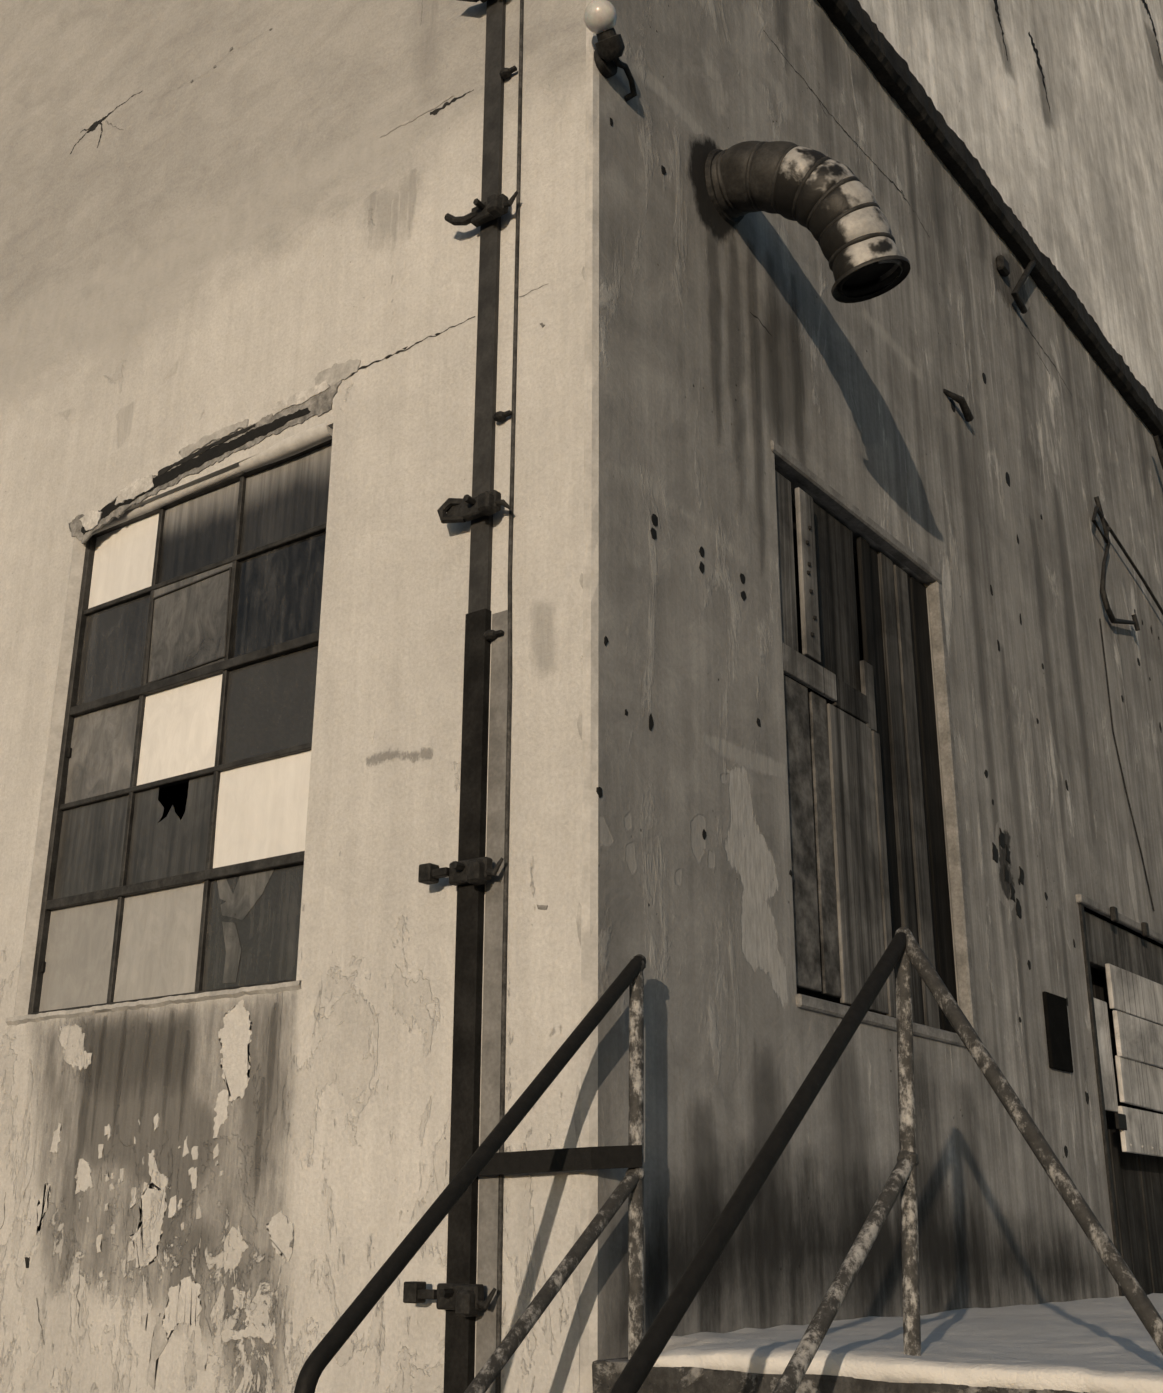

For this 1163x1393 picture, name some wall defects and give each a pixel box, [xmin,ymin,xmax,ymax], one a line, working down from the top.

crack [70,28,272,154]
crack [380,89,474,138]
peeling [0,42,462,457]
crack [350,316,475,377]
spalling [69,359,361,544]
peeling [59,1024,93,1070]
peeling [35,1182,51,1235]
peeling [50,1123,62,1154]
peeling [75,1000,252,1328]
leakage [20,966,310,1393]
peeling [266,1210,295,1261]
peeling [141,1225,274,1390]